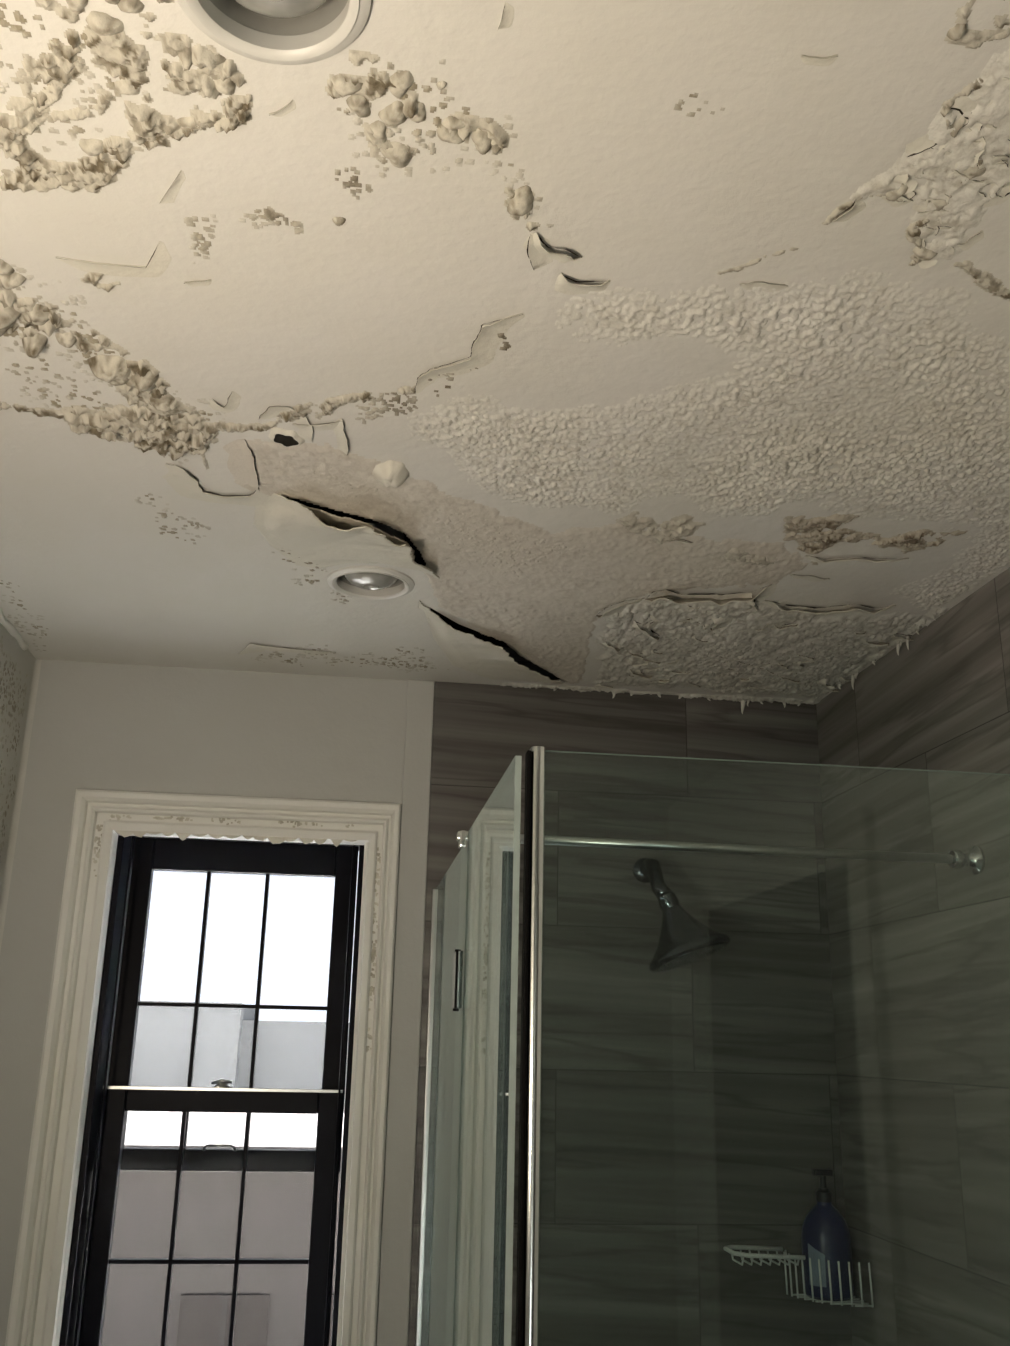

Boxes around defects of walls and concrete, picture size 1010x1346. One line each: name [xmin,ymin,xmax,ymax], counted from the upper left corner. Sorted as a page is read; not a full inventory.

flaking render [0,0,253,194]
peeling [822,0,1010,300]
crack [209,313,525,455]
flaking render [223,427,923,699]